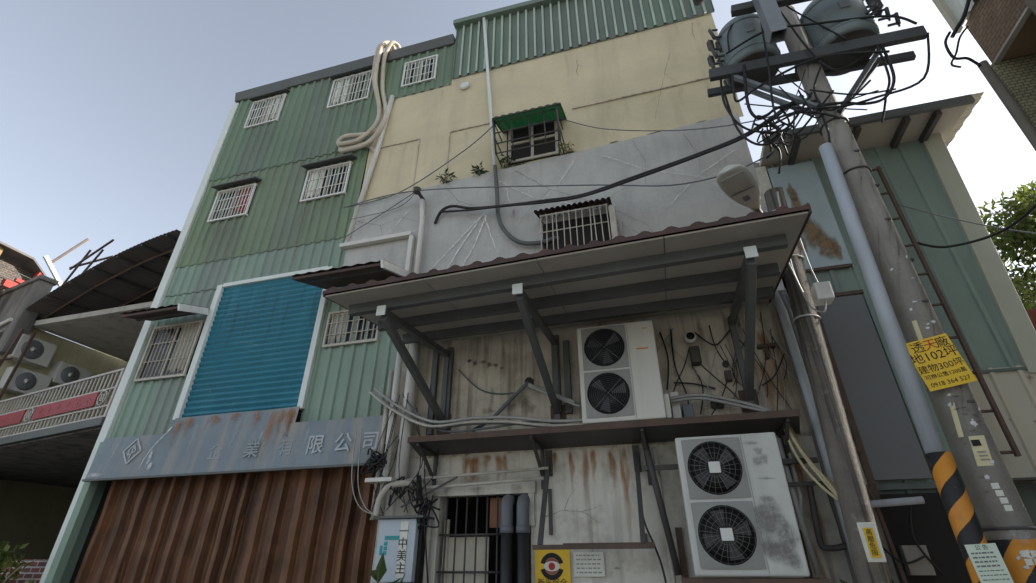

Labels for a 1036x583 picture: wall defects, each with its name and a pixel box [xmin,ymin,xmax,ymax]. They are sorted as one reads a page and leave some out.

crack [430,189,499,270]
crack [488,143,737,236]
peeling [779,185,800,207]
peeling [798,220,842,257]